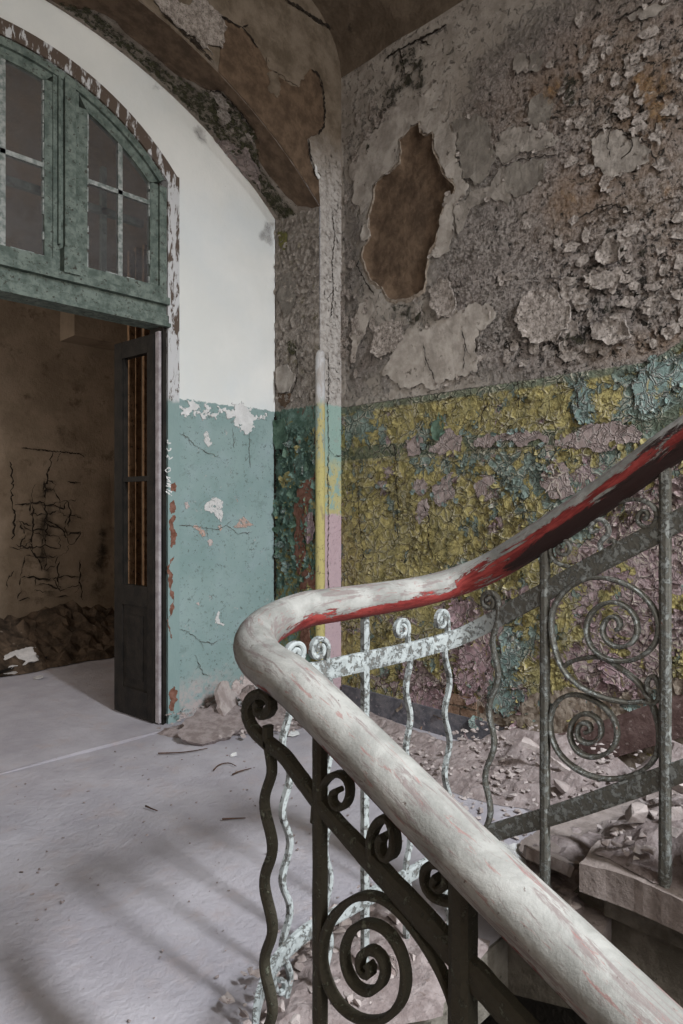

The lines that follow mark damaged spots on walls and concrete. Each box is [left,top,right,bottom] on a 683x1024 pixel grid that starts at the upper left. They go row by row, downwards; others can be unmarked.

spalling [52,0,683,598]
crack [6,447,85,601]
spalling [167,483,190,639]
crack [179,430,282,600]
peeling [429,478,659,636]